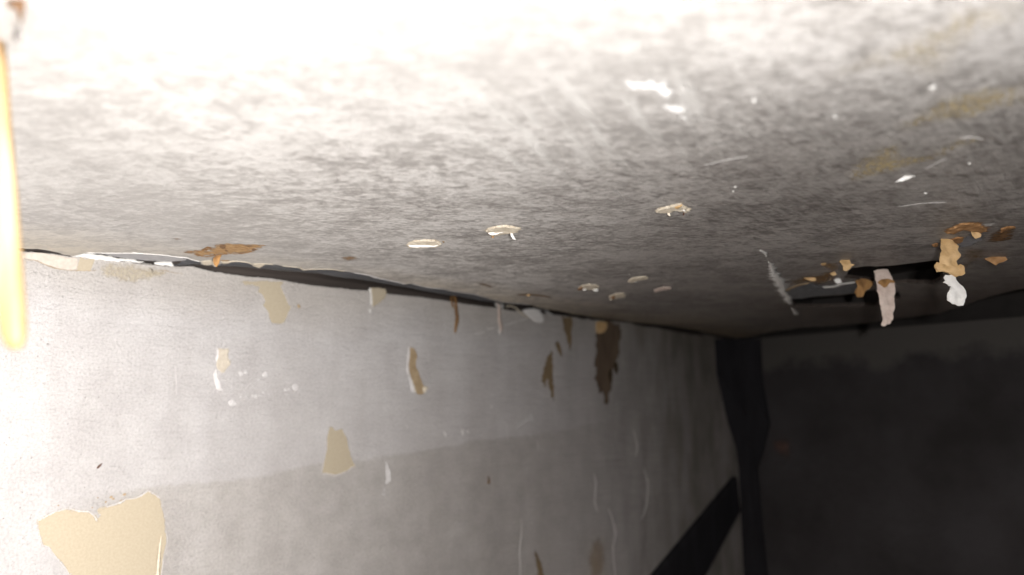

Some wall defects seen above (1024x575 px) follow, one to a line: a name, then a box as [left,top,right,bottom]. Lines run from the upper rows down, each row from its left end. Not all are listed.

peeling [655,202,692,216]
peeling [407,239,445,249]
peeling [485,225,522,240]
spalling [784,222,1015,326]
peeling [240,280,300,325]
peeling [450,295,459,333]
peeling [213,347,231,391]
peeling [406,346,428,395]
peeling [322,426,355,476]
peeling [36,490,168,575]